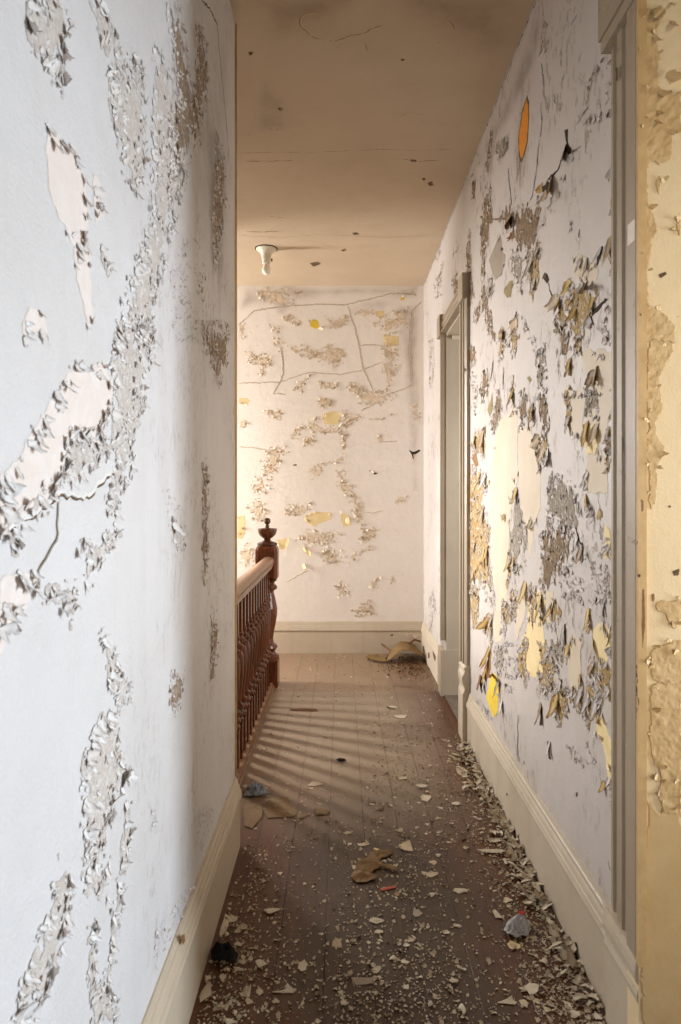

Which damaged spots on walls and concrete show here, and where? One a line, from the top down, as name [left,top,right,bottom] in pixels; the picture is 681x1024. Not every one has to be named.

crack [238,1,536,411]
crack [508,63,563,206]
peeling [646,69,681,96]
peeling [0,0,411,656]
peeling [433,96,624,798]
peeling [169,669,186,717]
peeling [209,610,220,690]
peeling [636,638,679,713]
peeling [11,627,140,1024]
peeling [654,765,681,812]